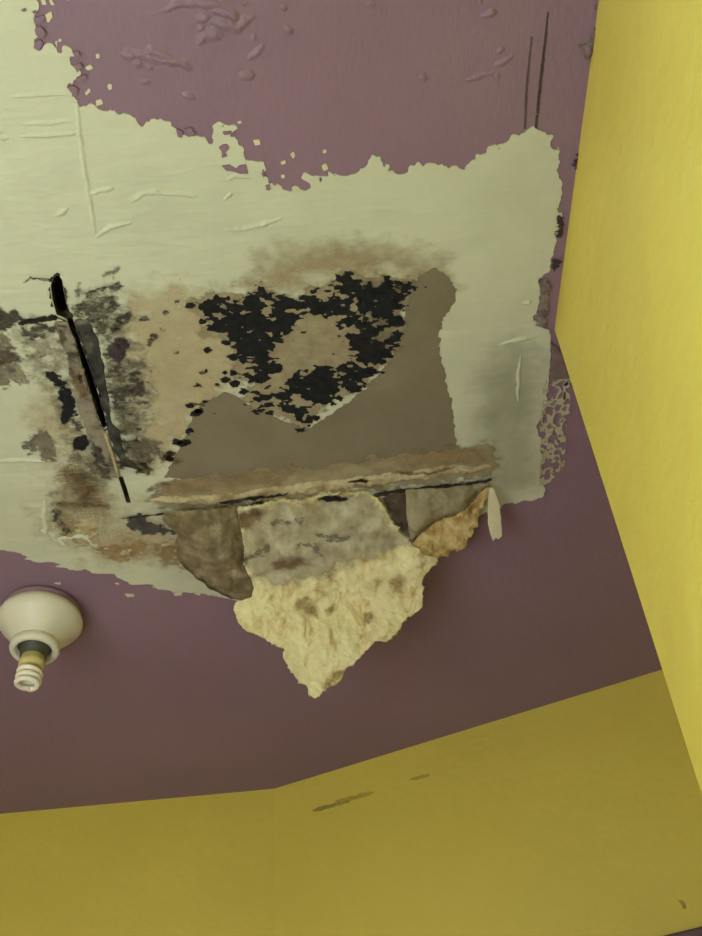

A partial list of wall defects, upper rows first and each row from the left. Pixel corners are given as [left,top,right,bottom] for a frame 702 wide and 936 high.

crack [524,12,549,129]
crack [18,273,108,431]
leakage [0,248,457,501]
peeling [0,0,571,601]